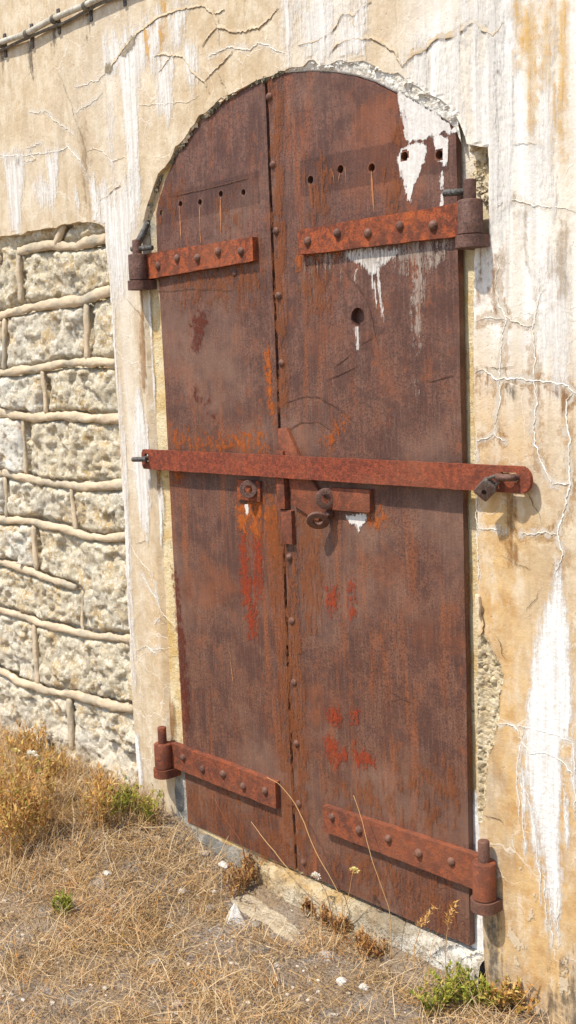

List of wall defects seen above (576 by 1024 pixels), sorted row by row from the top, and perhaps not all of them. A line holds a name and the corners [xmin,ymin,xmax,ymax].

crack [0,1,503,202]
damp [281,0,367,67]
spalling [248,58,489,210]
damp [402,0,519,237]
crack [474,251,576,657]
spalling [476,632,504,824]
damp [516,563,576,948]